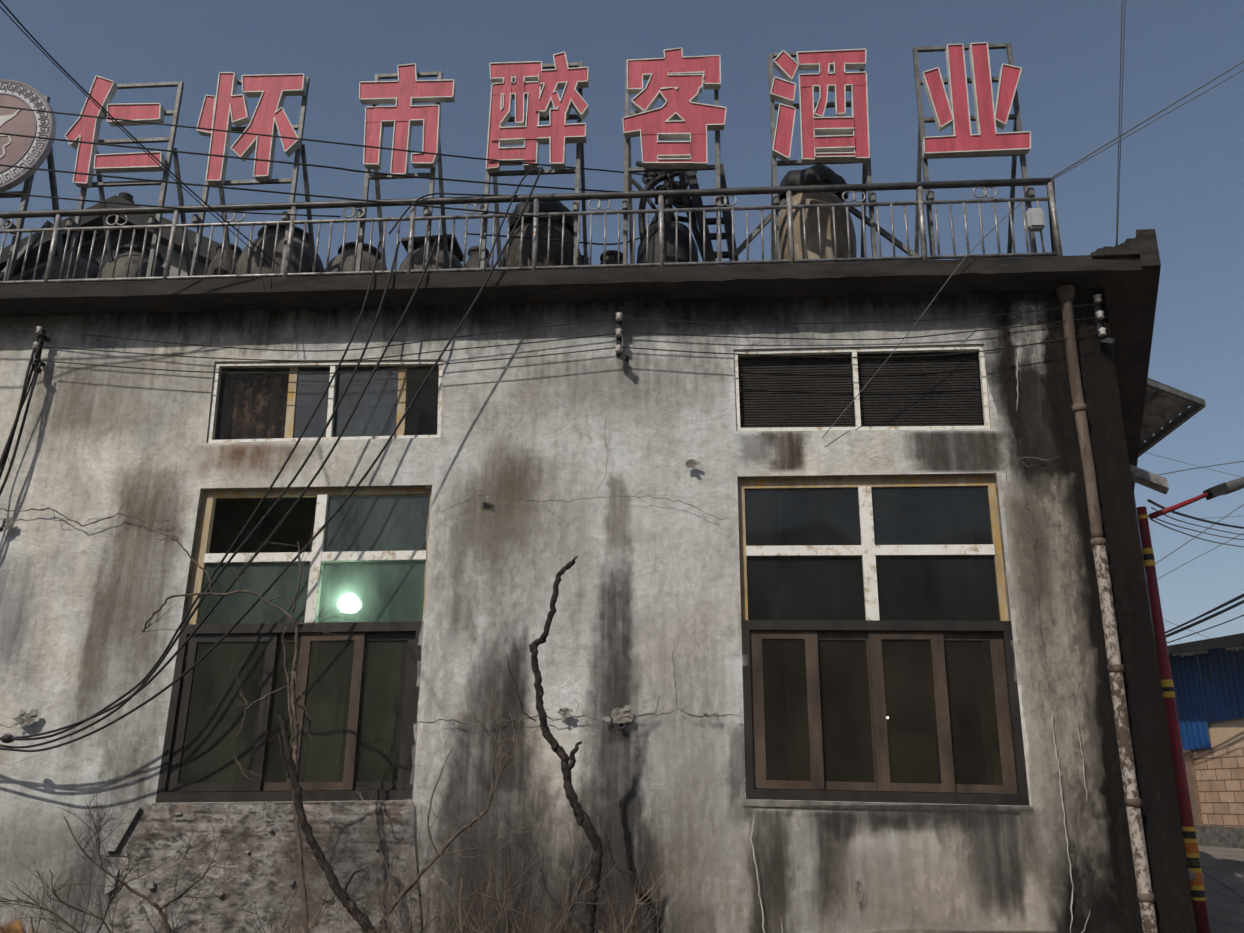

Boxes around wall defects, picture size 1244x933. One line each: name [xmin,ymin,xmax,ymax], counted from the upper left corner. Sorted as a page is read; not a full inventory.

crack [0,504,174,527]
water stain [759,431,803,469]
water stain [914,431,1002,470]
water stain [1012,336,1087,618]
water stain [101,482,174,677]
water stain [417,591,469,721]
crack [413,648,743,733]
water stain [425,574,693,933]
water stain [750,809,798,933]
water stain [813,805,1033,908]